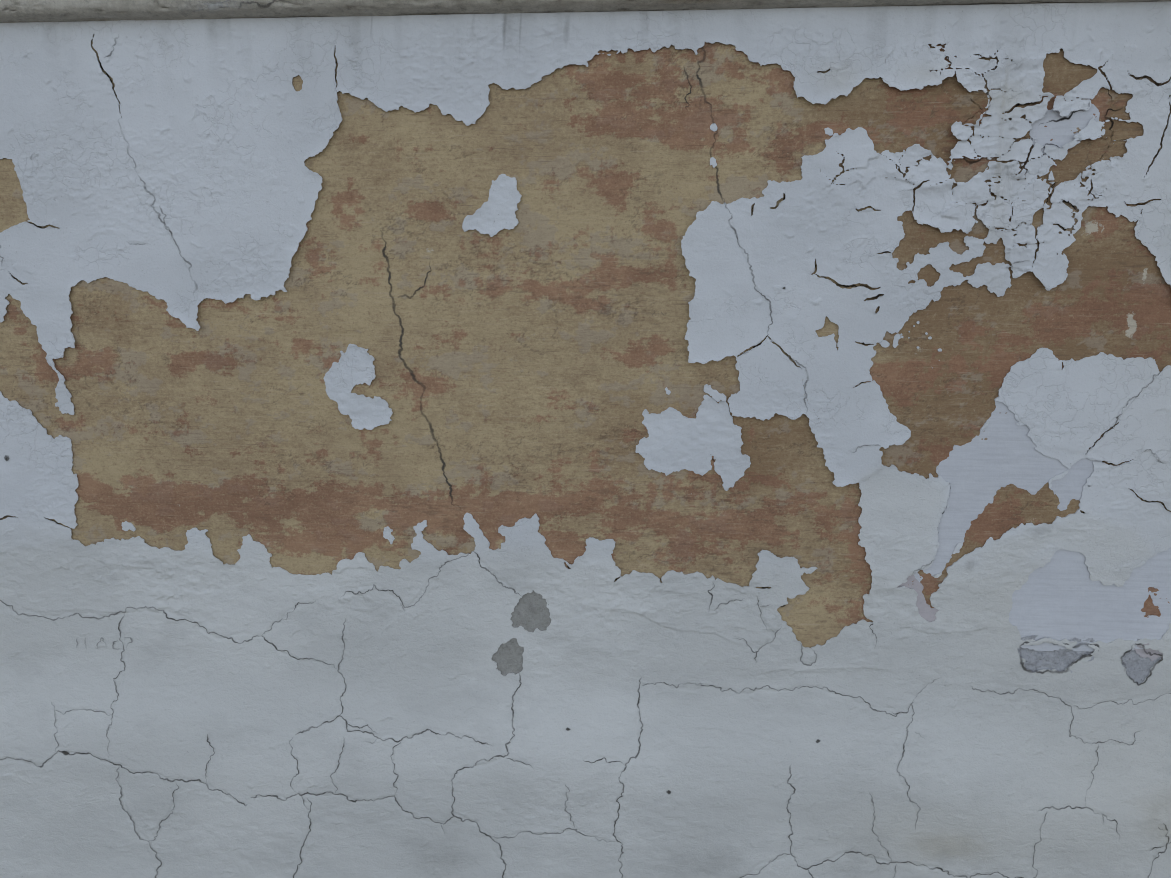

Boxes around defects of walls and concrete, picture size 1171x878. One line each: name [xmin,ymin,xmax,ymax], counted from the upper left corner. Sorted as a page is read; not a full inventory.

crack [382,243,431,382]
peeling [0,42,1171,648]
crack [429,424,452,498]
crack [4,585,917,878]
spalling [492,590,551,676]
crack [740,688,1171,878]
spalling [1018,635,1099,674]
spalling [1121,639,1163,686]